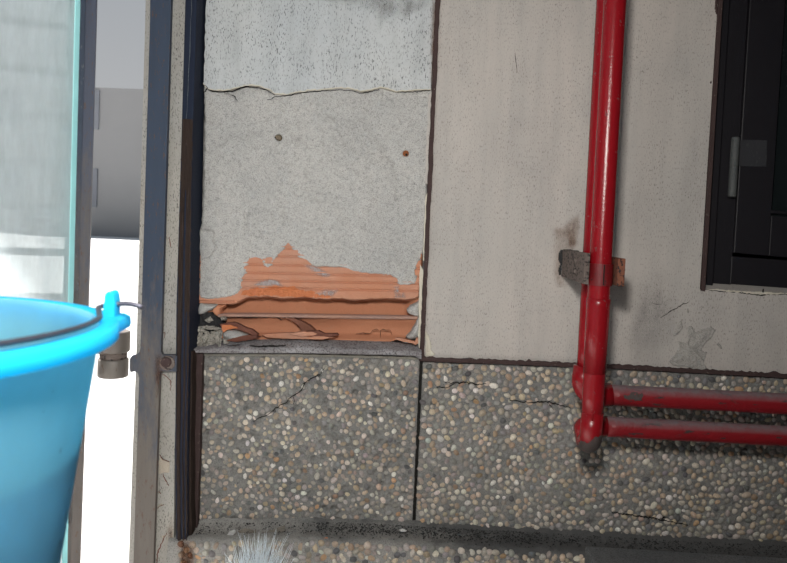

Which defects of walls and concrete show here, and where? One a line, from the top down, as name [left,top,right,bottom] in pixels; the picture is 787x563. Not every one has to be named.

crack [202,84,379,100]
spalling [198,83,435,357]
crack [437,381,486,389]
crack [253,368,325,422]
crack [510,400,570,410]